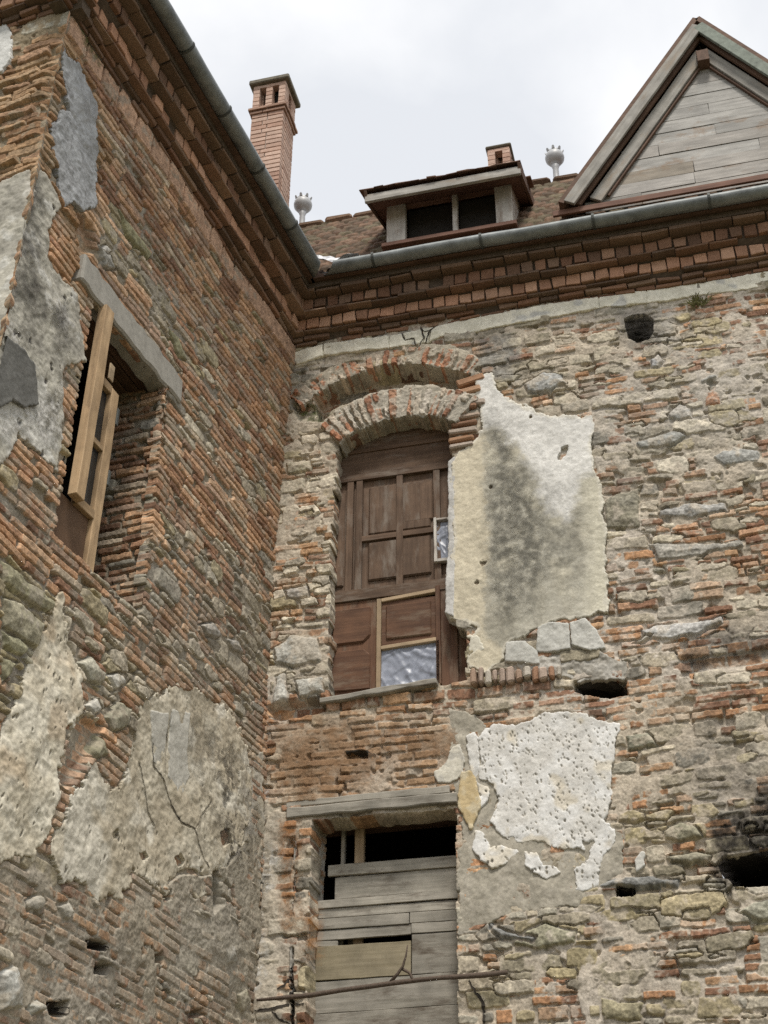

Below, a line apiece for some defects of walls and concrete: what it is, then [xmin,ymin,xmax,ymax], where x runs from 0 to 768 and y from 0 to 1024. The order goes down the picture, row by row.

peeling [0,170,37,337]
crack [401,326,436,346]
peeling [468,635,484,653]
spalling [505,618,628,699]
peeling [150,709,190,792]
crack [139,716,213,877]
flaking render [449,708,634,932]